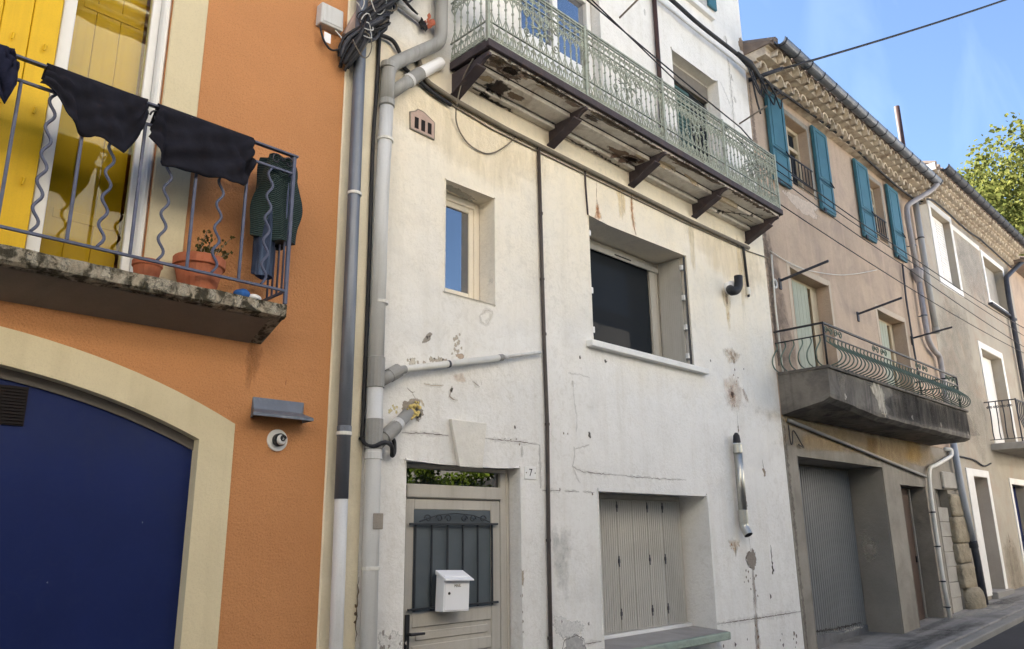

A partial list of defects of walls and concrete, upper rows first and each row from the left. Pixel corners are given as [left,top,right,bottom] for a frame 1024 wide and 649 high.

peeling [407,333,464,365]
crack [540,446,684,495]